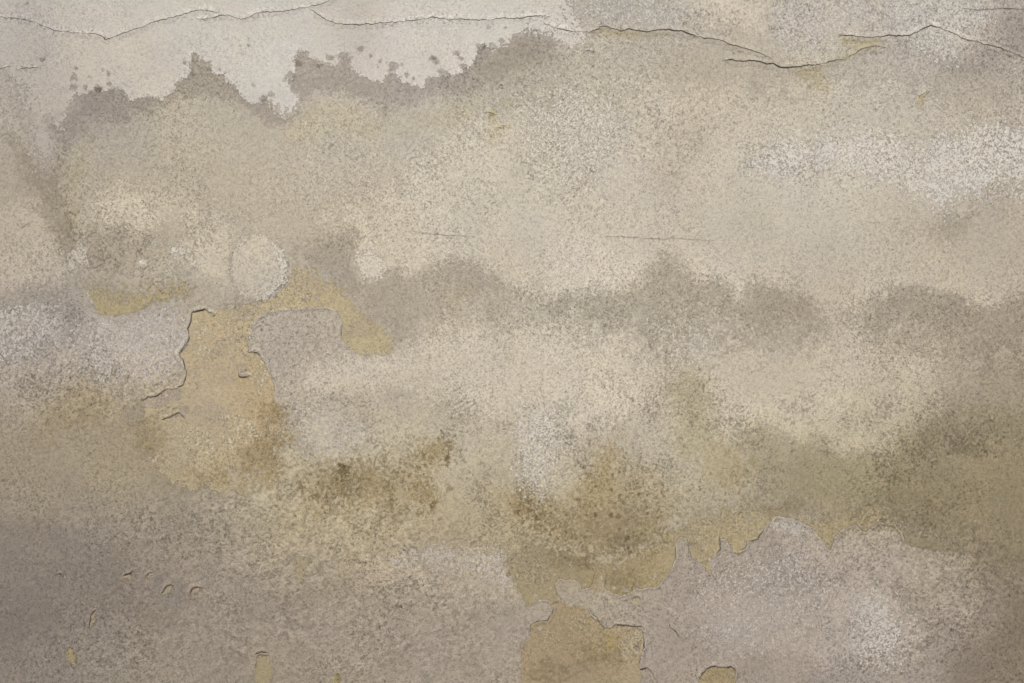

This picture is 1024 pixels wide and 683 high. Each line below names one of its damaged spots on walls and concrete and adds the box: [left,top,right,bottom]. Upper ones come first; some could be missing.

crack [0,0,1024,74]
water stain [493,66,644,208]
efflorescence [64,241,92,277]
efflorescence [355,247,389,282]
peeling [77,263,396,502]
water stain [631,305,743,384]
efflorescence [499,383,578,503]
efflorescence [374,535,515,597]
peeling [502,492,958,683]